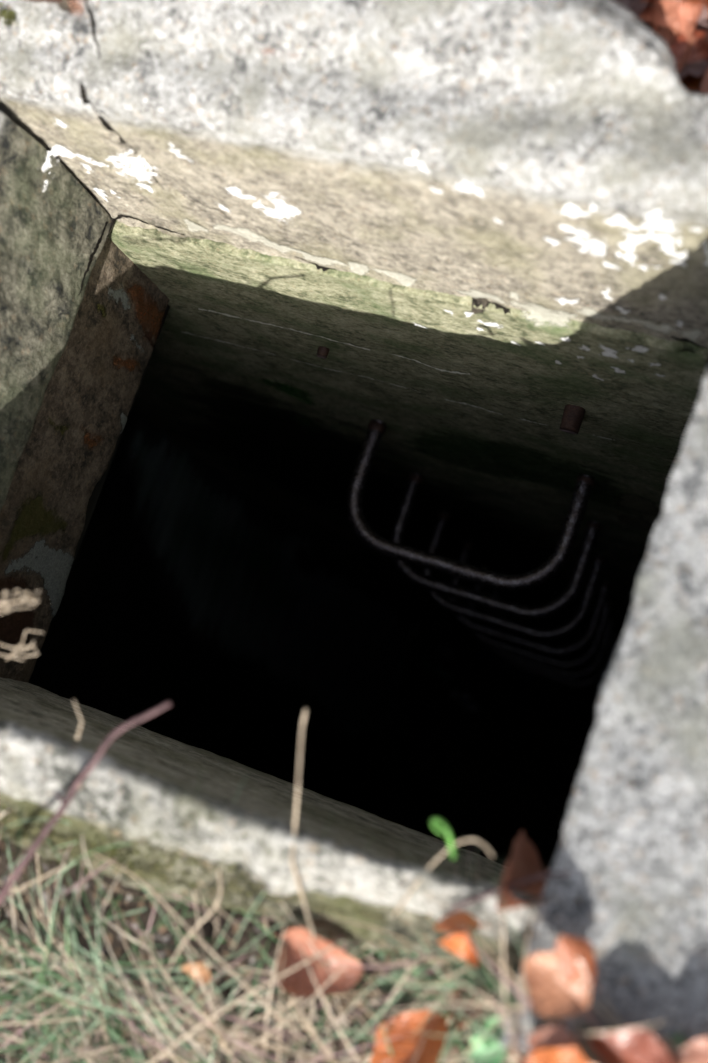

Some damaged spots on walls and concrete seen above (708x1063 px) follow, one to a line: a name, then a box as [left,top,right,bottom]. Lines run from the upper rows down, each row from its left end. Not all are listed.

crack [84,0,101,59]
crack [79,83,241,227]
crack [79,214,184,294]
crack [296,257,338,272]
crack [467,295,511,316]
crack [671,336,706,349]